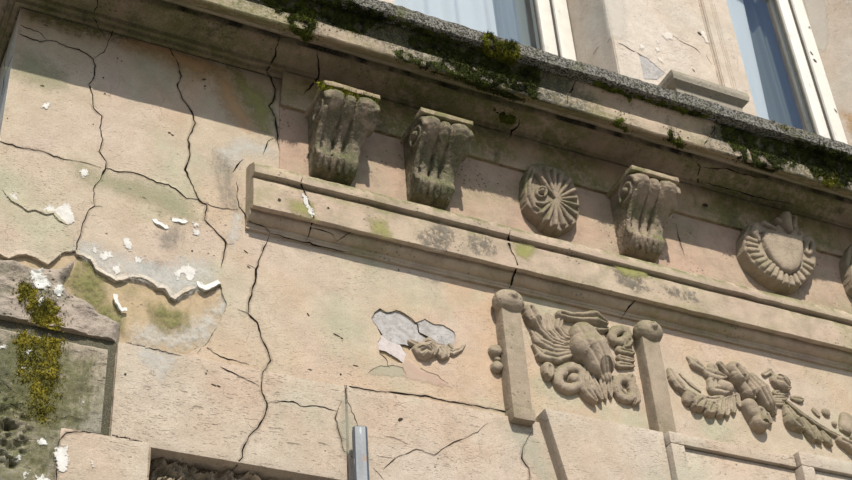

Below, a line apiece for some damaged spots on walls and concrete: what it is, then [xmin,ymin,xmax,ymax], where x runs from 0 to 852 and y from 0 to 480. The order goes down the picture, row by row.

peeling [2,186,75,225]
peeling [152,217,200,235]
crack [0,0,505,480]
water stain [515,245,533,258]
water stain [67,259,123,332]
flaking render [0,237,221,344]
peeling [372,310,455,363]
peeling [37,436,70,472]